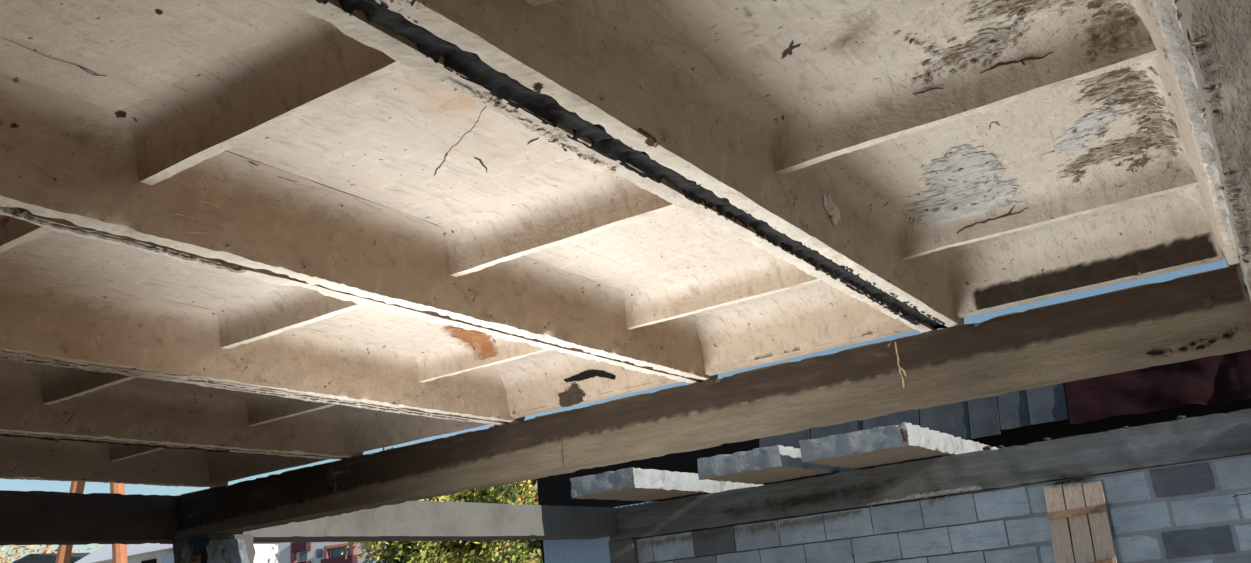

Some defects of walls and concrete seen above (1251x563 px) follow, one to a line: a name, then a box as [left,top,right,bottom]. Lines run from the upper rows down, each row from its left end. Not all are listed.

crack [4,38,107,76]
crack [980,52,1053,74]
crack [434,107,487,175]
peeling [893,0,1187,198]
water stain [1148,0,1238,253]
peeling [905,141,1023,227]
corrosion [445,326,497,360]
water stain [177,266,1243,530]
water stain [657,480,982,545]